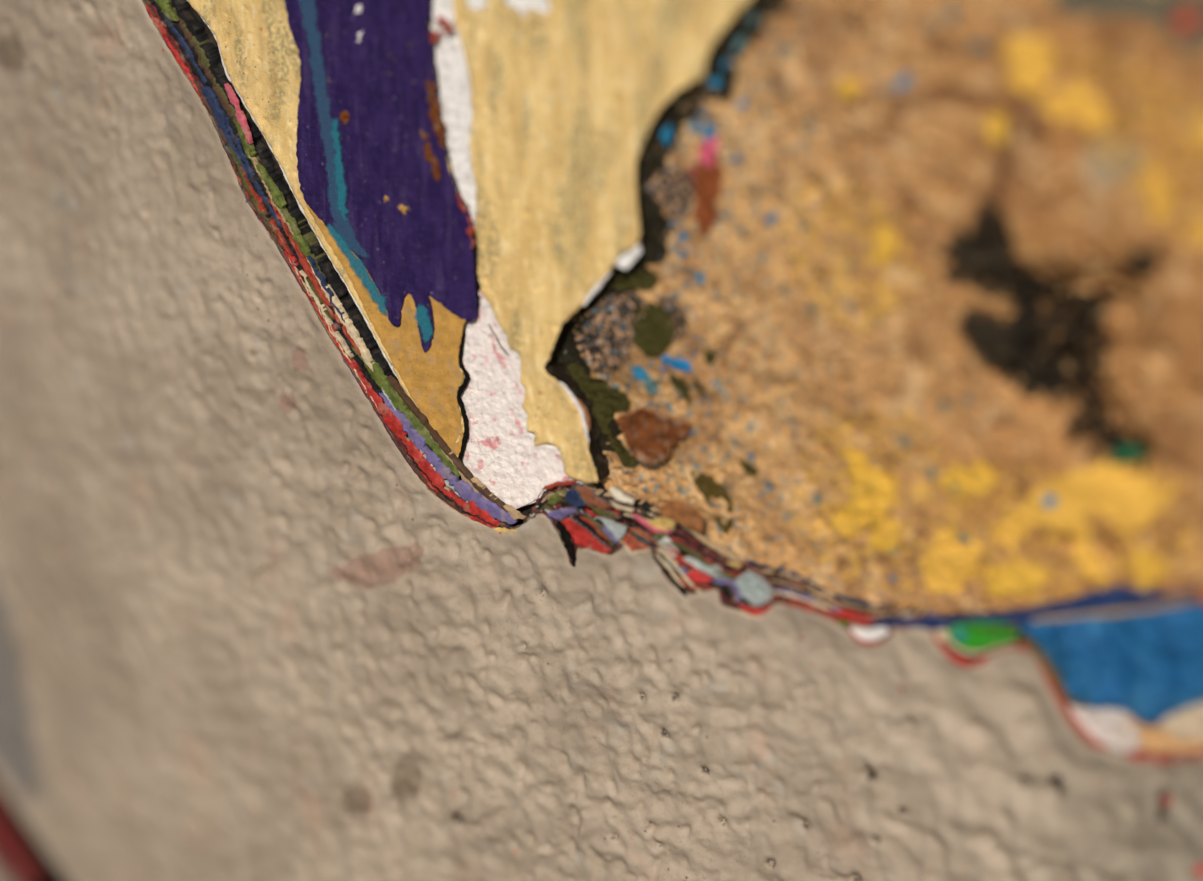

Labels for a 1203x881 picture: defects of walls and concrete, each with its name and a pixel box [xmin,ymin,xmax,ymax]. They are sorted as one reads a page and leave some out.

peeling [144,0,1203,763]